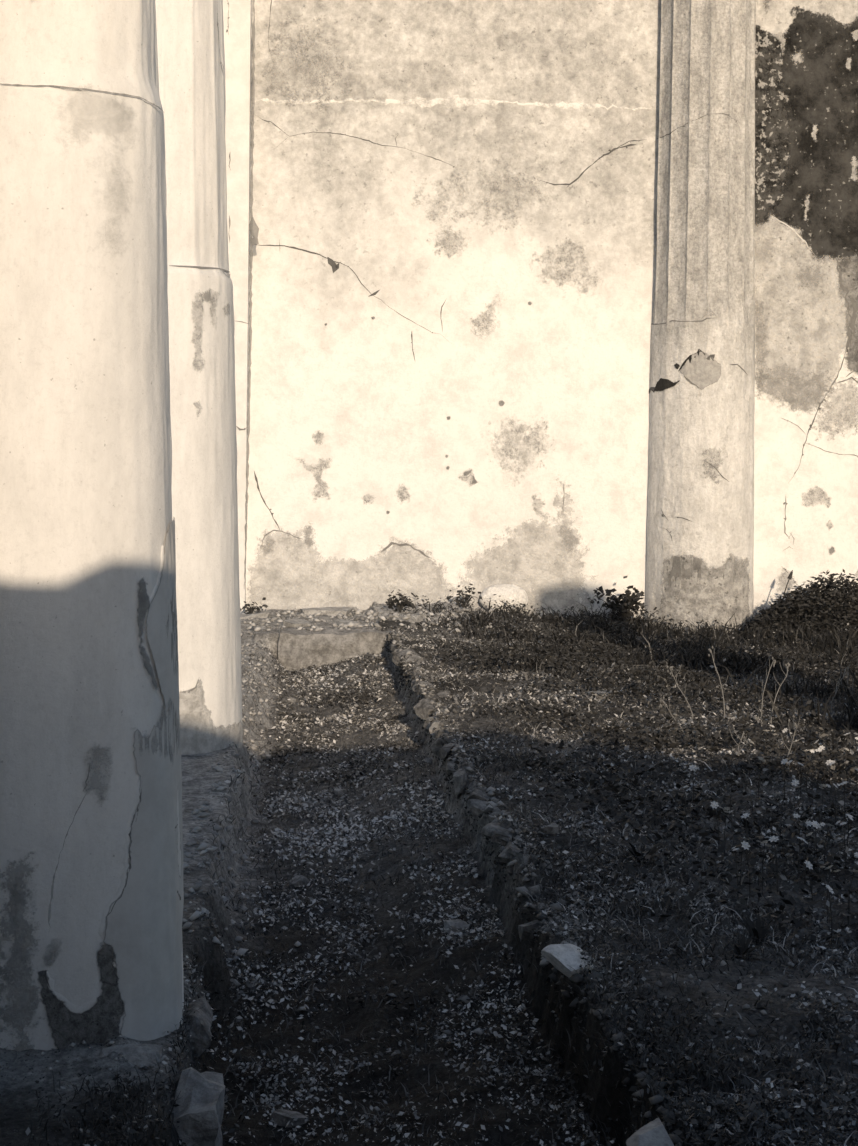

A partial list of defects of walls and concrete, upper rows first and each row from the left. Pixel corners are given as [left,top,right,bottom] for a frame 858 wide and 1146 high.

crack [0,83,163,111]
crack [170,0,454,587]
crack [540,113,739,185]
spalling [649,349,721,393]
peeling [755,6,858,412]
crack [781,348,858,582]
damp [814,379,858,441]
peeling [0,517,243,1052]